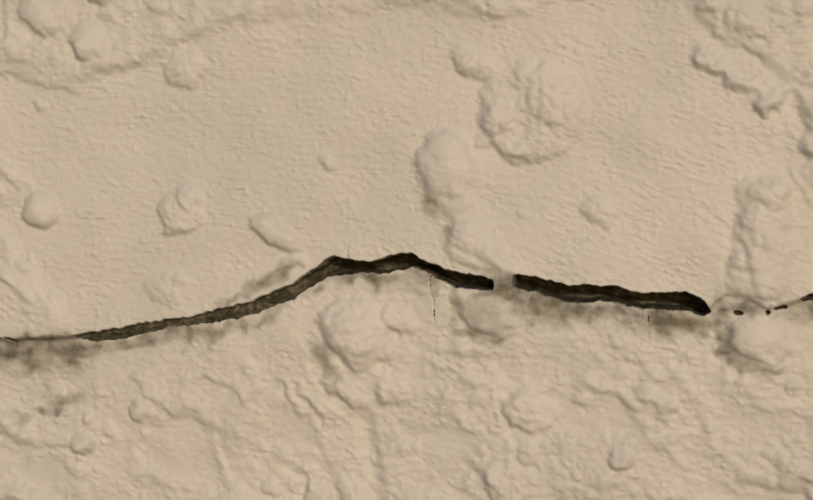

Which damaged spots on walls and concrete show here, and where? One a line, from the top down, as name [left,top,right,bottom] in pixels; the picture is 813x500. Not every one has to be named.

crack [62,253,494,342]
crack [514,274,711,322]
crack [765,294,813,315]